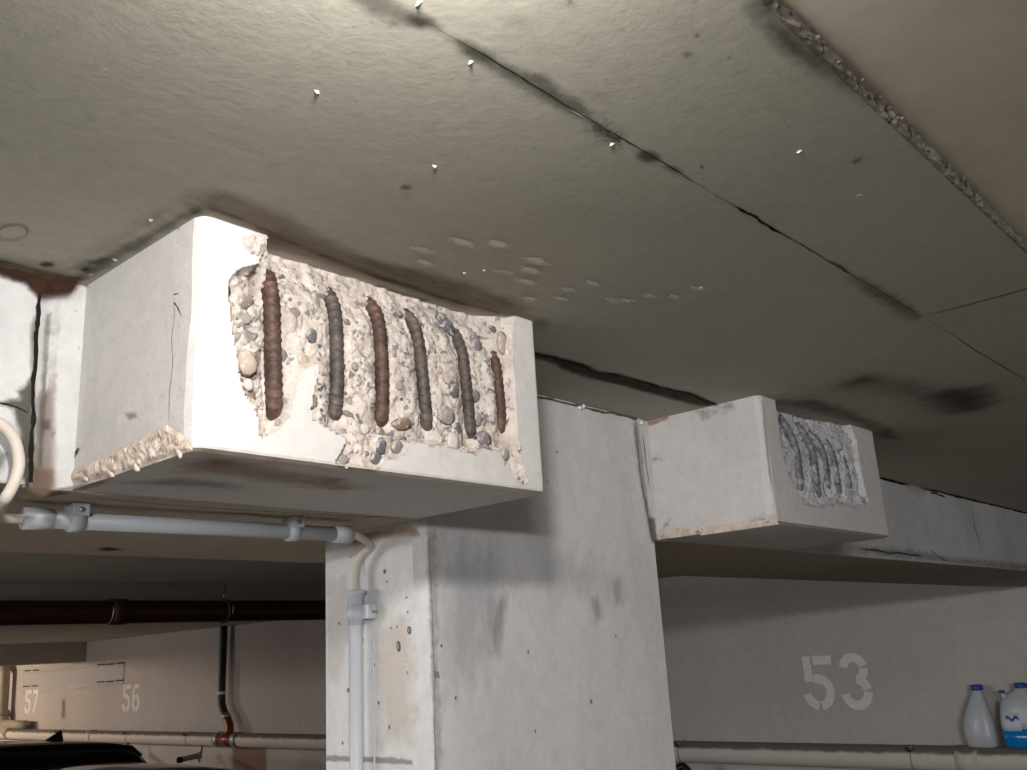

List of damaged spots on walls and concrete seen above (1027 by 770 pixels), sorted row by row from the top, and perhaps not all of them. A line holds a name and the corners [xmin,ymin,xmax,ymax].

crack [434,26,1027,382]
spalling [758,0,1027,254]
crack [0,295,42,482]
spalling [71,424,193,483]
spalling [227,233,528,486]
crack [537,396,656,542]
crack [534,353,717,406]
spalling [775,404,869,510]